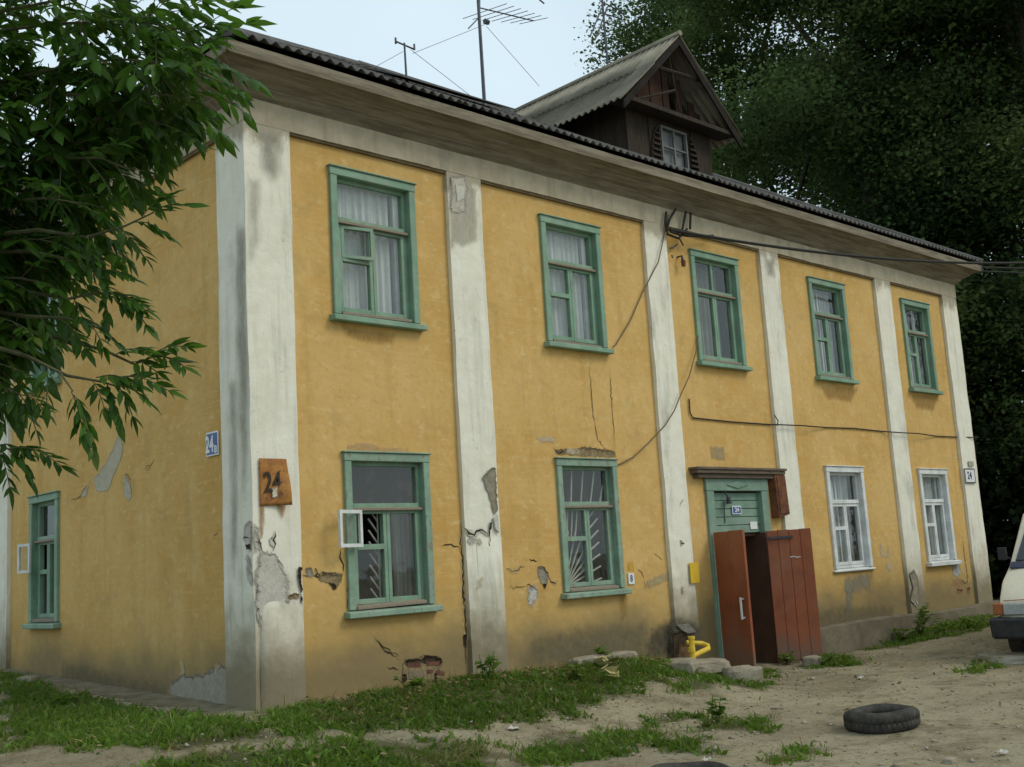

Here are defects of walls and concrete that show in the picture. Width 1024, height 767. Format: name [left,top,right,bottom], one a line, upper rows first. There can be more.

peeling [450,175,468,213]
crack [589,366,615,451]
peeling [74,436,131,501]
spalling [537,437,616,458]
spalling [482,467,499,533]
peeling [243,521,342,626]
crack [443,521,492,660]
crack [506,558,557,589]
peeling [527,566,549,606]
spalling [169,662,226,704]
crack [375,638,399,670]
spalling [402,655,445,683]